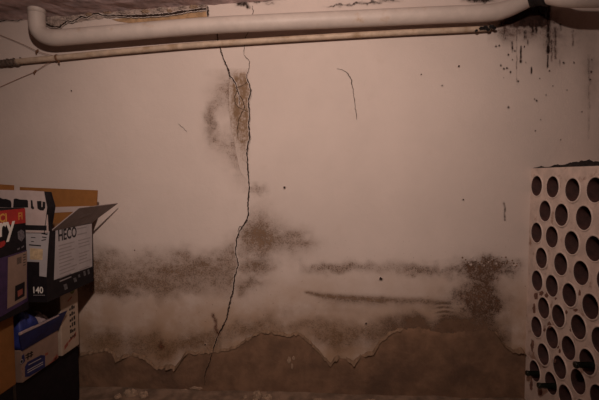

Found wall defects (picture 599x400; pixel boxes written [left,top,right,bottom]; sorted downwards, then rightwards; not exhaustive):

flaking render [46,4,210,29]
leakage [512,6,561,67]
crack [339,69,357,120]
crack [204,33,252,385]
leakage [82,217,308,298]
leakage [384,254,518,341]
flaking render [78,327,542,398]